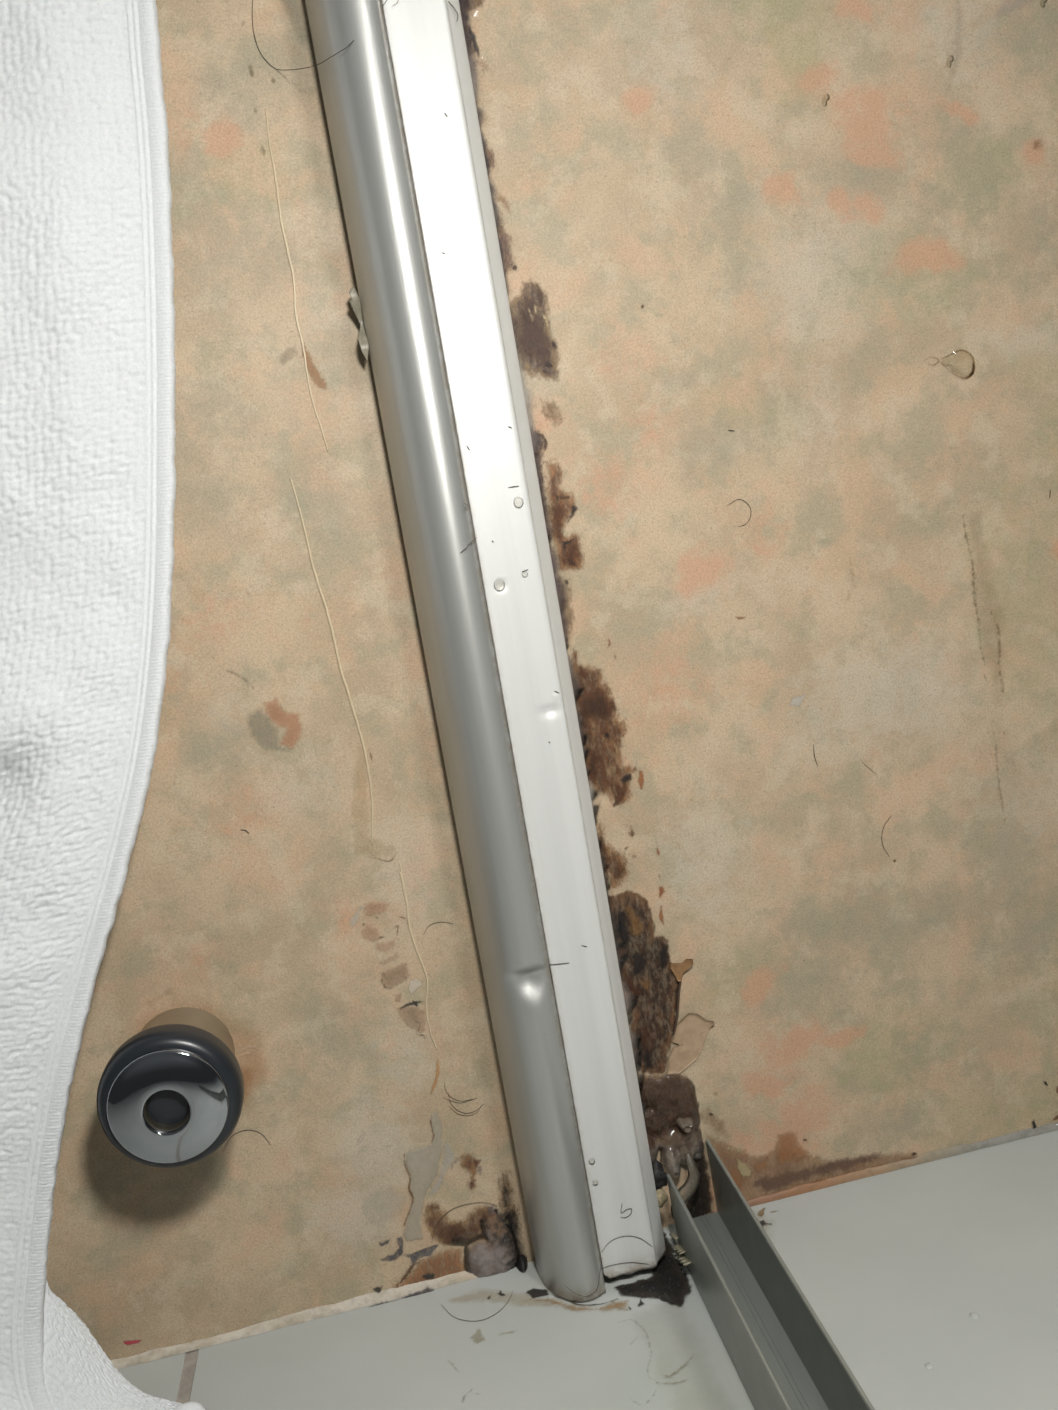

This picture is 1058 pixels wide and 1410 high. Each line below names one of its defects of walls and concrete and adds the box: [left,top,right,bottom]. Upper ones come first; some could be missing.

peeling [400,978,422,1036]
peeling [667,959,715,1074]